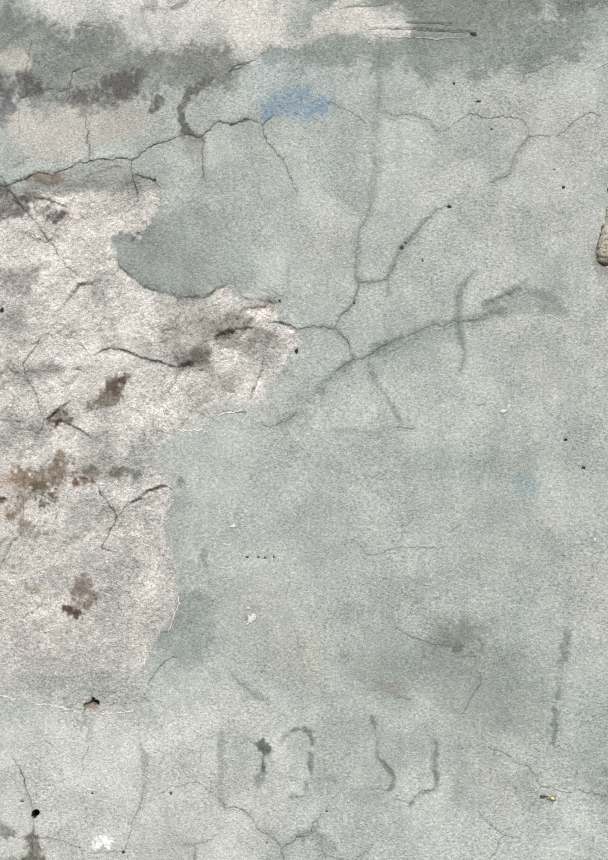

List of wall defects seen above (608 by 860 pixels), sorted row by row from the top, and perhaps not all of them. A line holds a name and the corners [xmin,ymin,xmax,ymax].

crack [377,51,601,182]
crack [0,115,295,296]
water stain [0,0,608,438]
crack [268,207,477,372]
crack [22,338,90,437]
crack [60,323,178,393]
flaking render [0,186,300,718]
water stain [0,818,50,860]
crack [9,758,142,859]
crack [164,741,367,860]
crack [484,746,608,814]